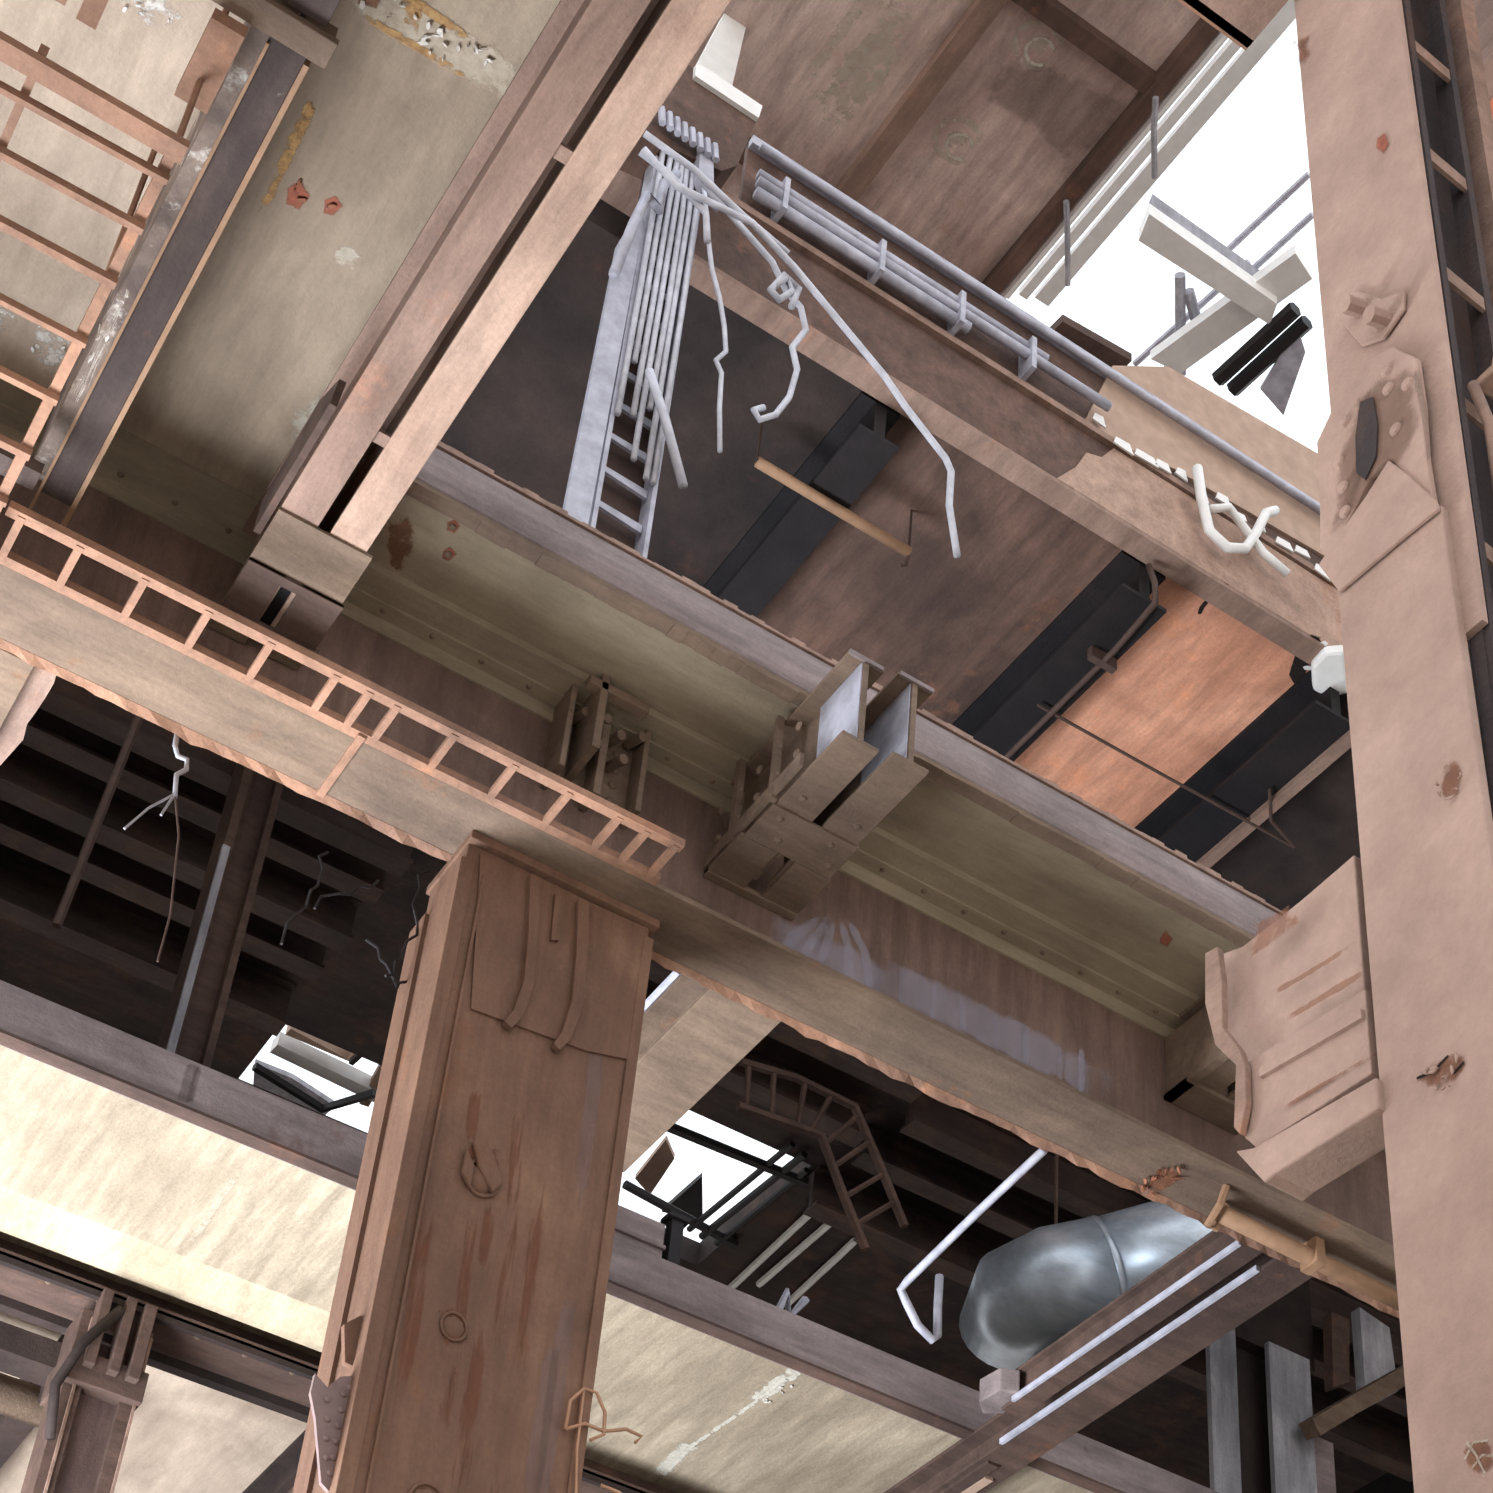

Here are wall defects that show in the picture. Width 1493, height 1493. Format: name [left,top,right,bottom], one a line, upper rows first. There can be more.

corrosion [262,102,342,215]
corrosion [1377,134,1388,152]
corrosion [387,519,412,570]
corrosion [405,441,838,706]
corrosion [914,709,1298,955]
corrosion [1434,762,1462,800]